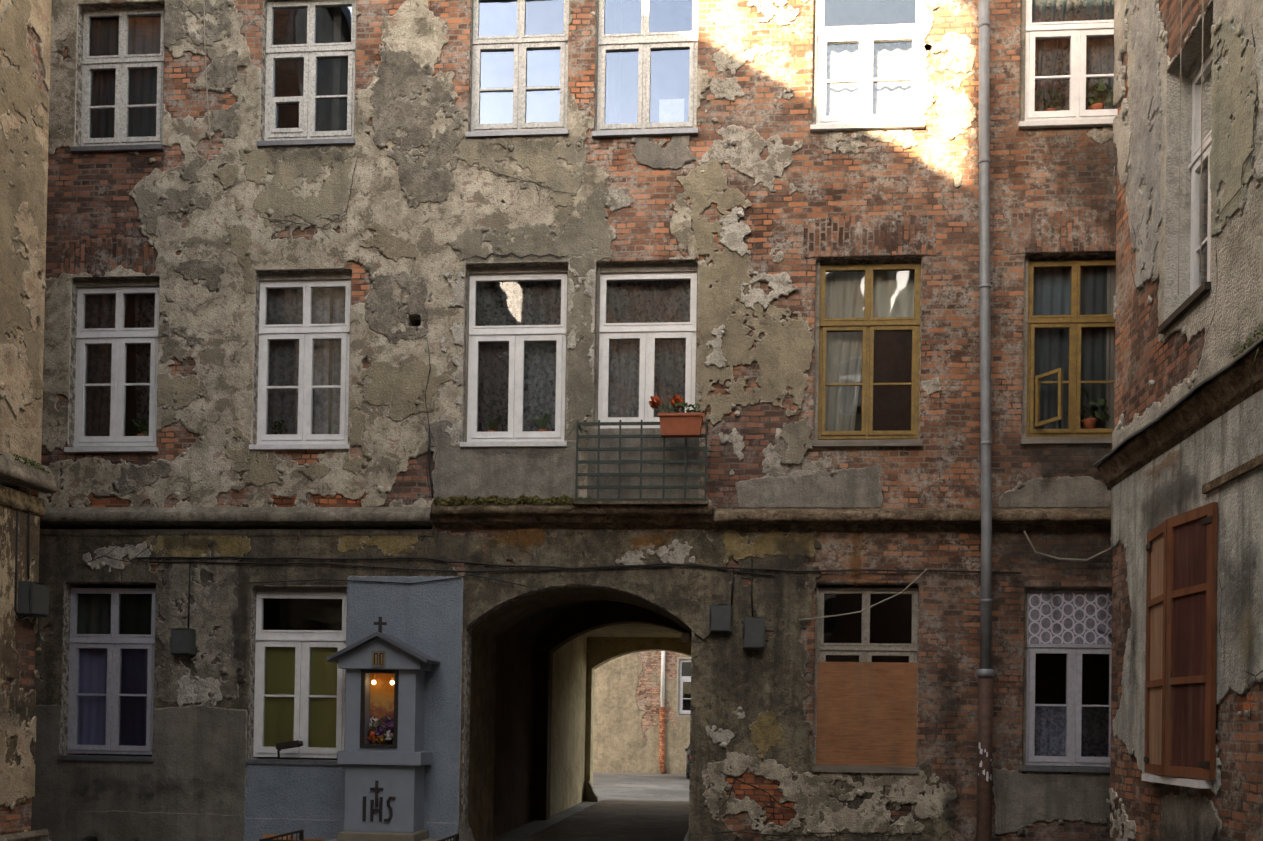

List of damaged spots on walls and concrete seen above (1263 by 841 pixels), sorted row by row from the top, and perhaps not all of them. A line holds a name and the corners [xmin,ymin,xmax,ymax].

peeling [0,0,359,420]
peeling [345,0,837,508]
peeling [1086,0,1259,429]
peeling [41,295,209,507]
peeling [215,323,464,507]
leakage [1011,542,1113,568]
peeling [0,706,42,841]
peeling [702,707,957,841]
flaking render [1005,542,1263,841]